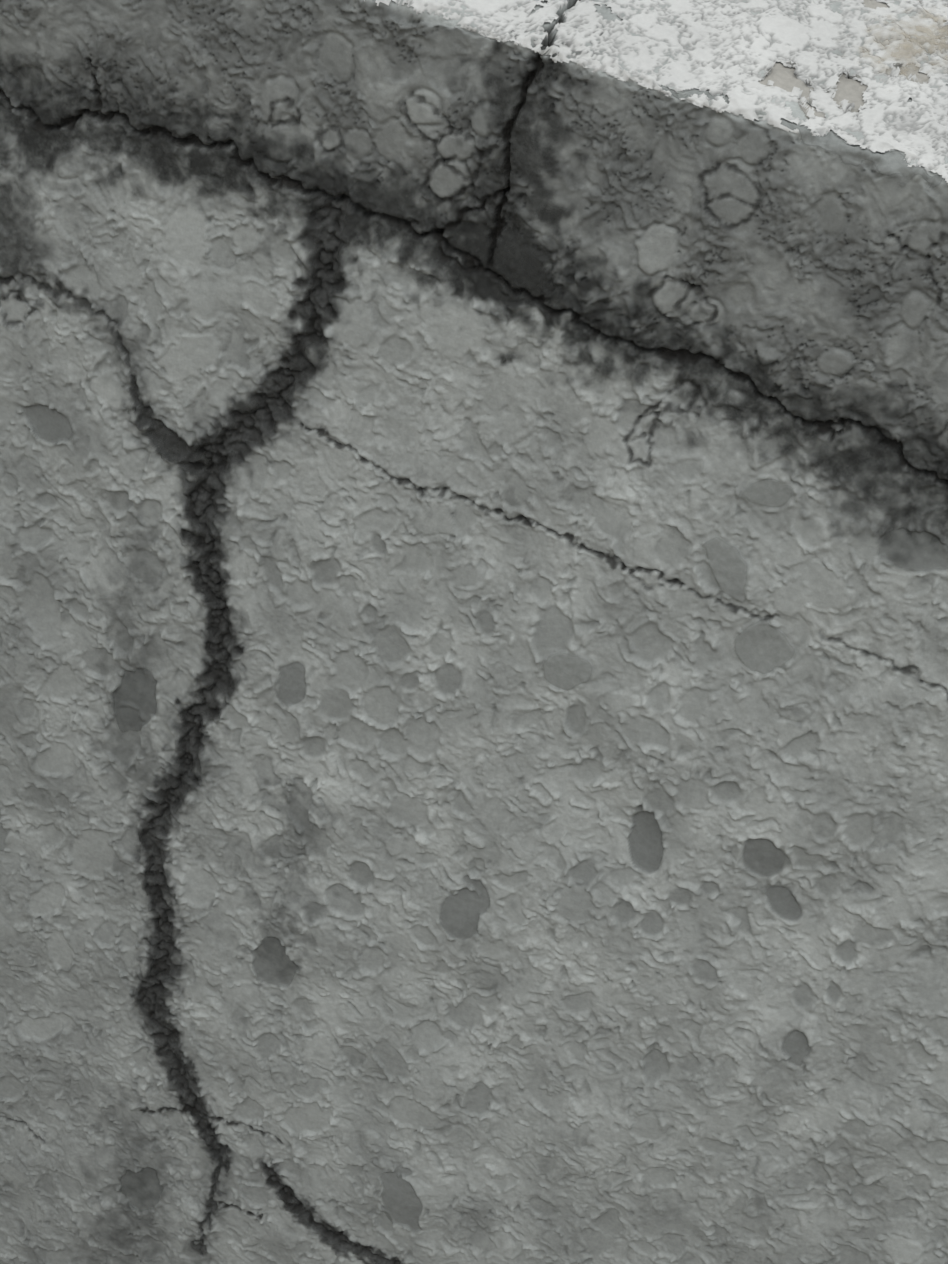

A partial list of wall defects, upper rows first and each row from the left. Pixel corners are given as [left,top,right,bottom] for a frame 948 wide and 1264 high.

crack [0,58,234,147]
crack [883,434,948,488]
crack [130,17,875,1264]
crack [829,638,938,686]